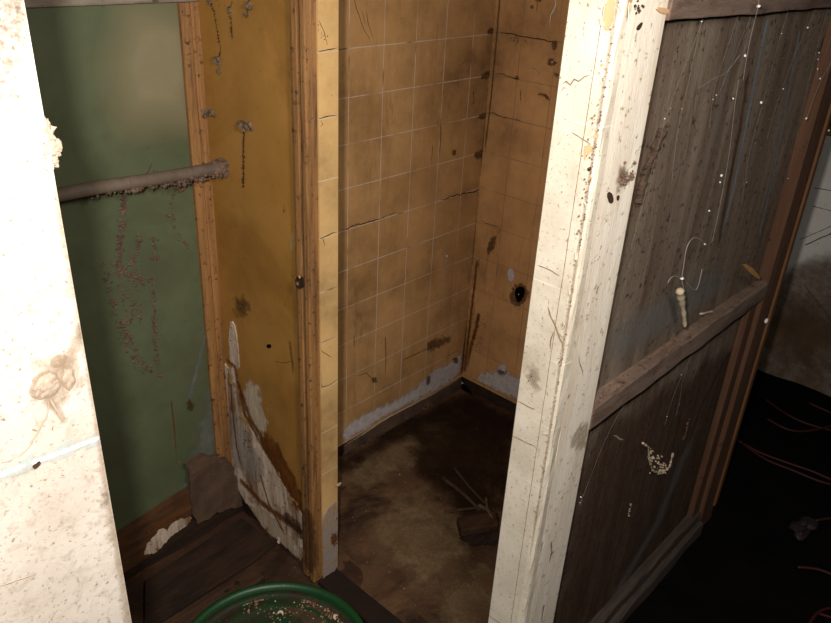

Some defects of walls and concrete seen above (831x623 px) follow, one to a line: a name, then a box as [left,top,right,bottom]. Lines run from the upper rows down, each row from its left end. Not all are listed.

damp [474,0,500,165]
crack [501,32,563,46]
peeling [569,54,611,310]
peeling [144,514,192,555]
peeling [225,321,303,559]
corrosion [259,431,302,510]
damp [342,219,477,439]
damp [478,364,535,400]